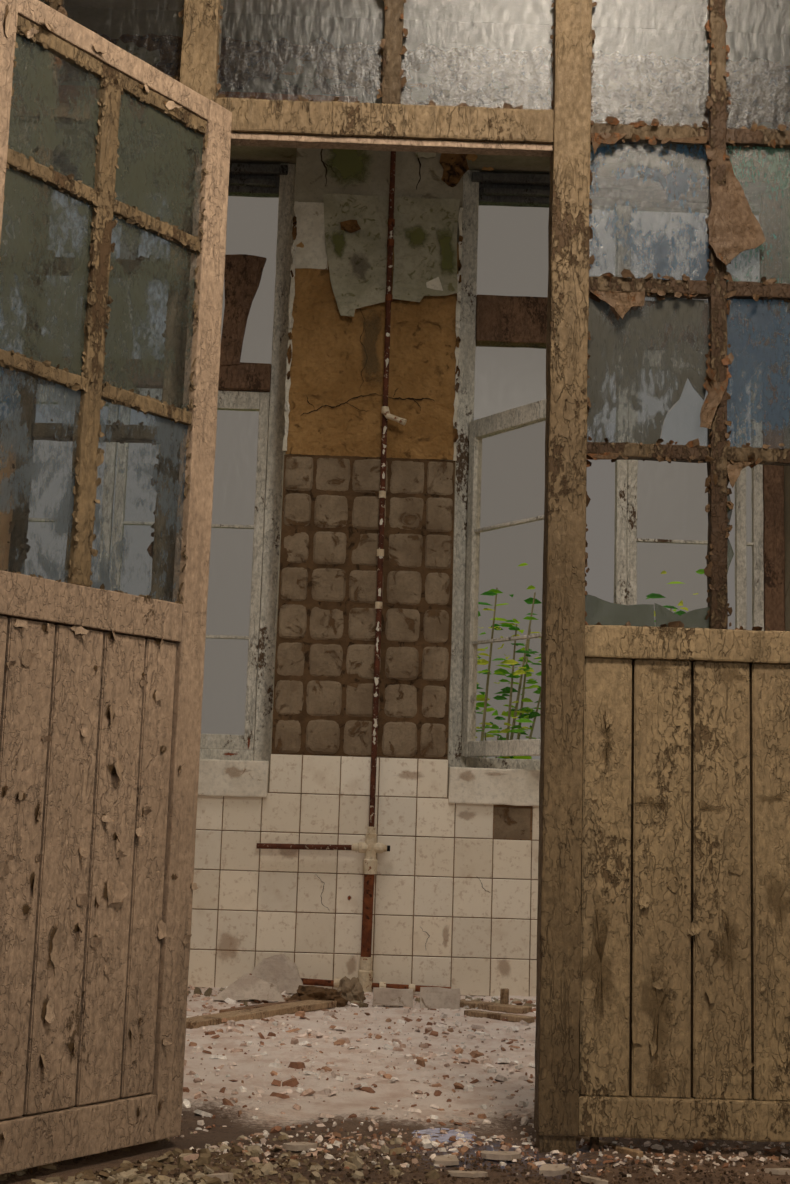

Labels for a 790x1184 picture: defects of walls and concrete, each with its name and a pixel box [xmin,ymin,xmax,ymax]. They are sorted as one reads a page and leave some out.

spalling [401,43,552,110]
damp [327,149,369,184]
spalling [590,50,790,266]
crack [302,310,434,415]
peeling [271,152,494,759]